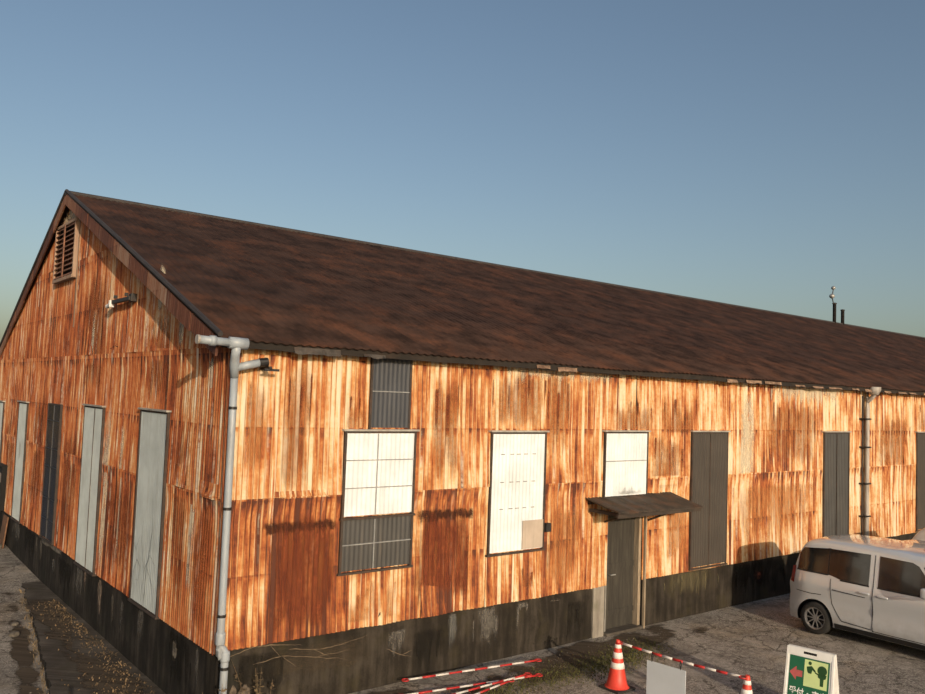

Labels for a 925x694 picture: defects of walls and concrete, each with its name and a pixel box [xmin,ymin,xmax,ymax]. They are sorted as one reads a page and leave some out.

corrosion [286,375,313,480]
corrosion [435,390,459,429]
corrosion [518,375,569,431]
corrosion [771,404,816,452]
corrosion [193,511,210,621]
corrosion [418,509,473,596]